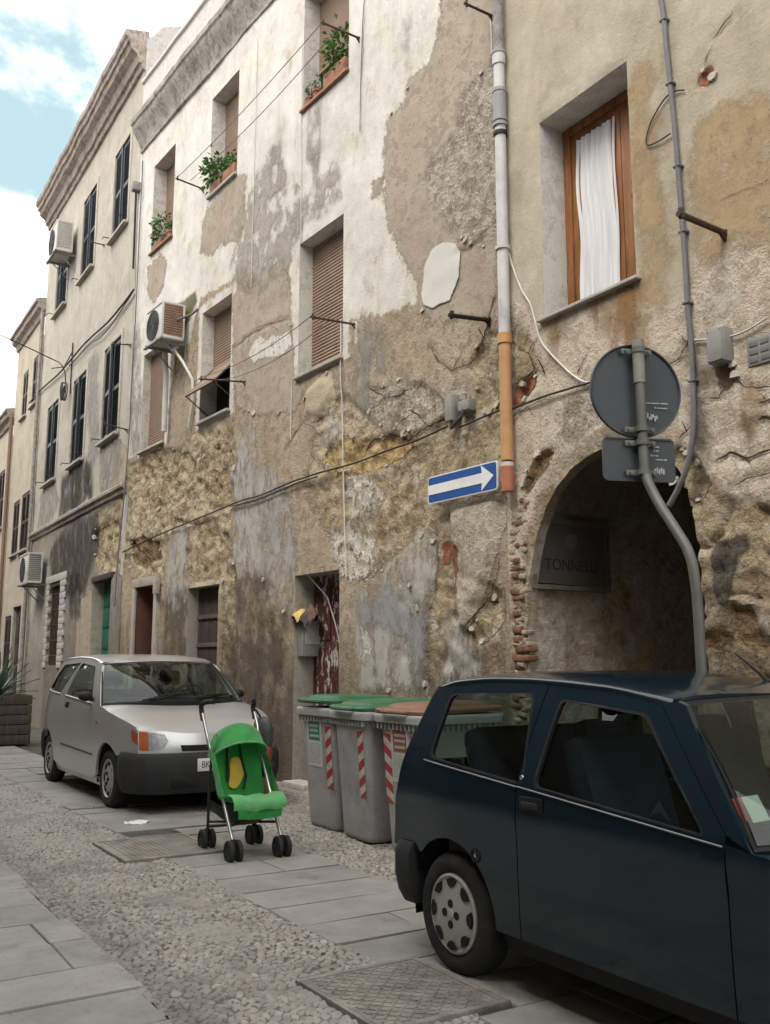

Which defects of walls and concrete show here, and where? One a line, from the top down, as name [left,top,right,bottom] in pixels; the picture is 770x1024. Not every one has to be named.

peeling [199,174,247,257]
peeling [322,0,537,477]
crack [430,295,495,372]
crack [364,386,445,456]
crack [708,378,770,420]
peeling [92,430,297,622]
leakage [69,574,80,618]
flaking render [443,448,554,683]
flaking render [510,695,532,723]